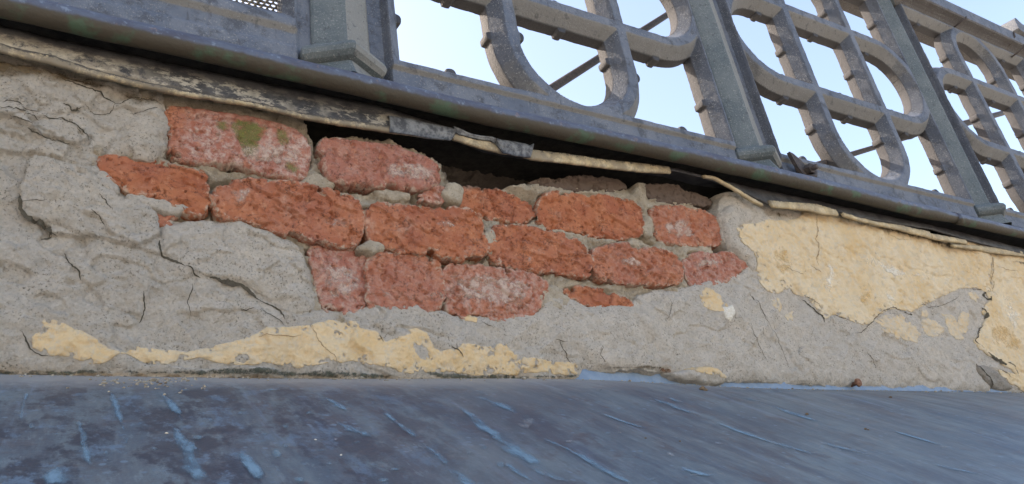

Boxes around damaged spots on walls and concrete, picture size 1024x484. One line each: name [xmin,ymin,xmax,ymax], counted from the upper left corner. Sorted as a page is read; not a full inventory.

crack [2,80,158,144]
crack [18,194,81,280]
crack [158,240,338,365]
spalling [32,89,1024,392]